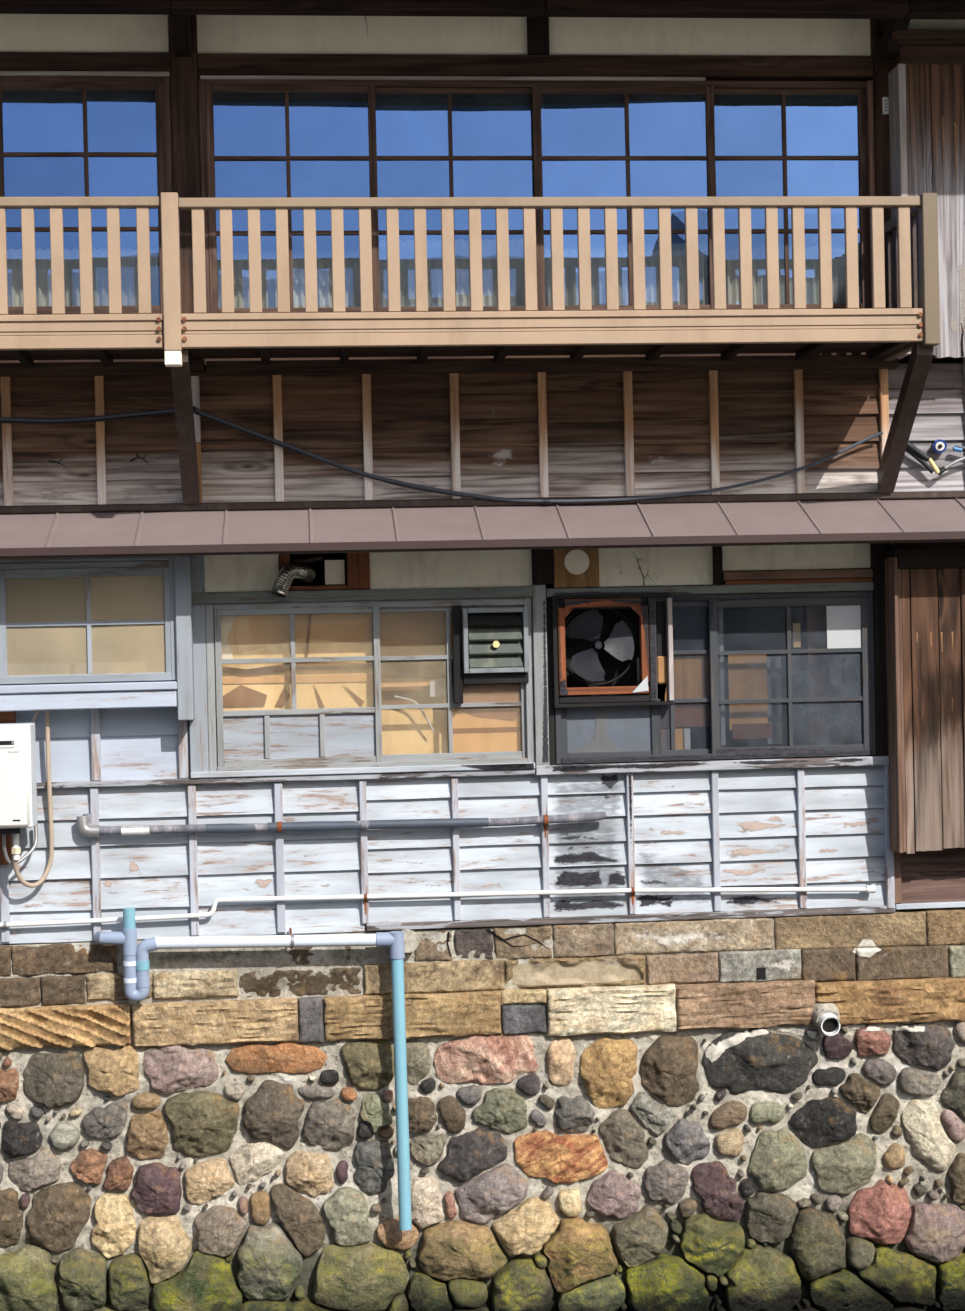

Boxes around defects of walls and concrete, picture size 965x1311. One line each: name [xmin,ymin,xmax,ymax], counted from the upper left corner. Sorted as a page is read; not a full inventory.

peeling [723,816,788,880]
crack [486,929,549,949]